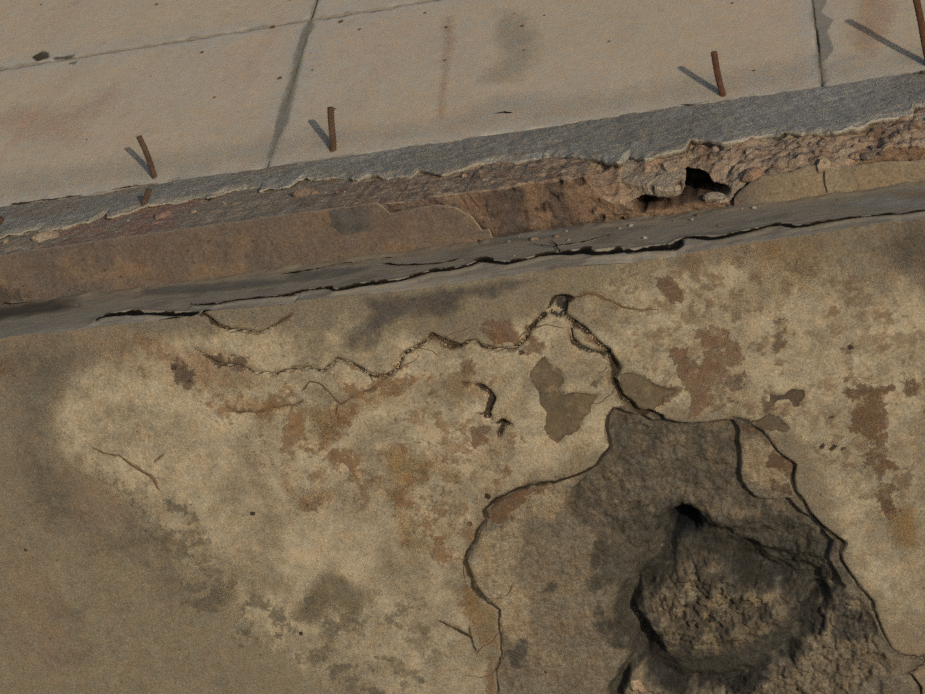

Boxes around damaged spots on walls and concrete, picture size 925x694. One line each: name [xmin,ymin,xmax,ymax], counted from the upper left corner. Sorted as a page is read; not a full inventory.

spalling [275,22,313,136]
spalling [0,107,925,255]
crack [96,210,925,333]
crack [92,447,163,491]
crack [195,292,661,694]
water stain [53,256,925,694]
spalling [467,372,923,694]
crack [760,430,925,694]